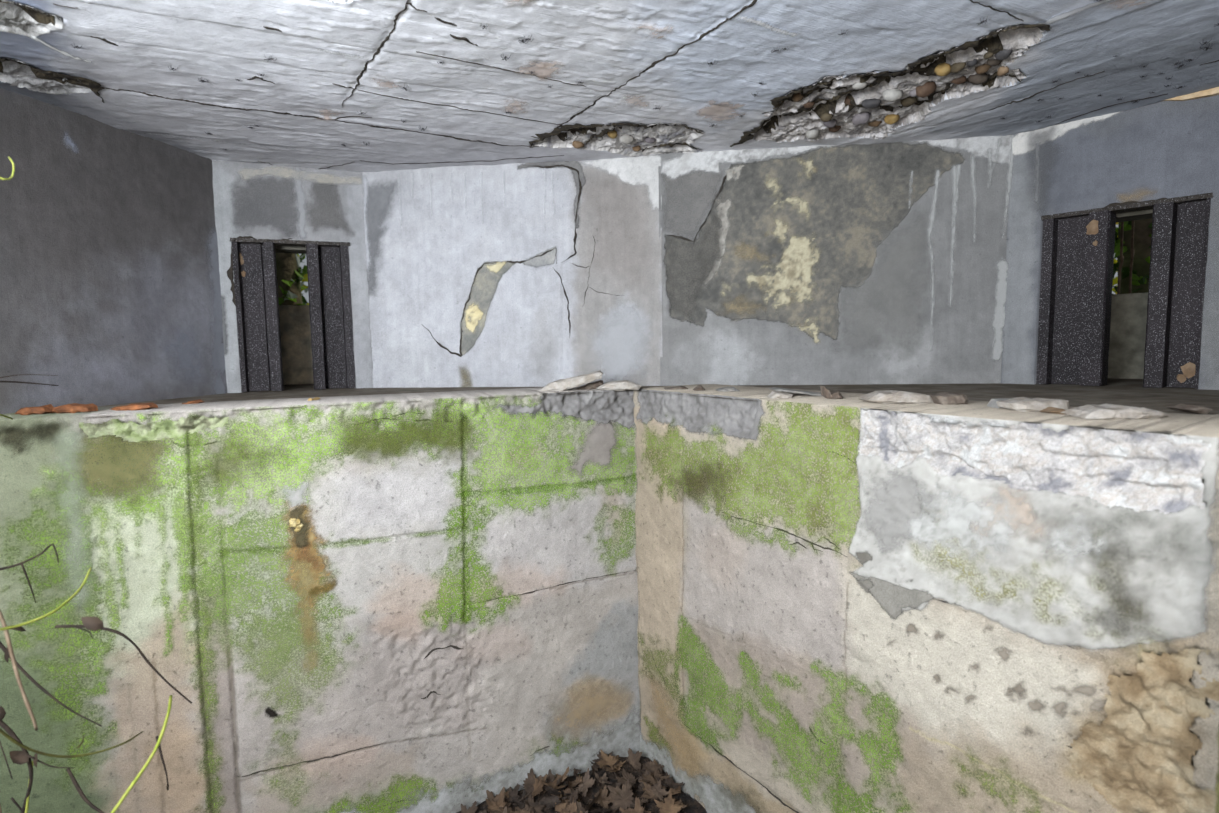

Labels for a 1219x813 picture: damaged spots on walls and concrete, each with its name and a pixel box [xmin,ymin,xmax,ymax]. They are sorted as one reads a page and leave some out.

crack [970,0,1023,21]
spalling [0,57,105,96]
crack [99,0,757,169]
spalling [528,123,704,157]
spalling [730,24,1050,147]
crack [1055,94,1167,125]
leakage [426,112,1118,387]
leakage [0,424,165,603]
leakage [286,484,307,507]
leakage [344,413,472,458]
spalling [858,409,1211,514]
corrosion [285,502,337,669]